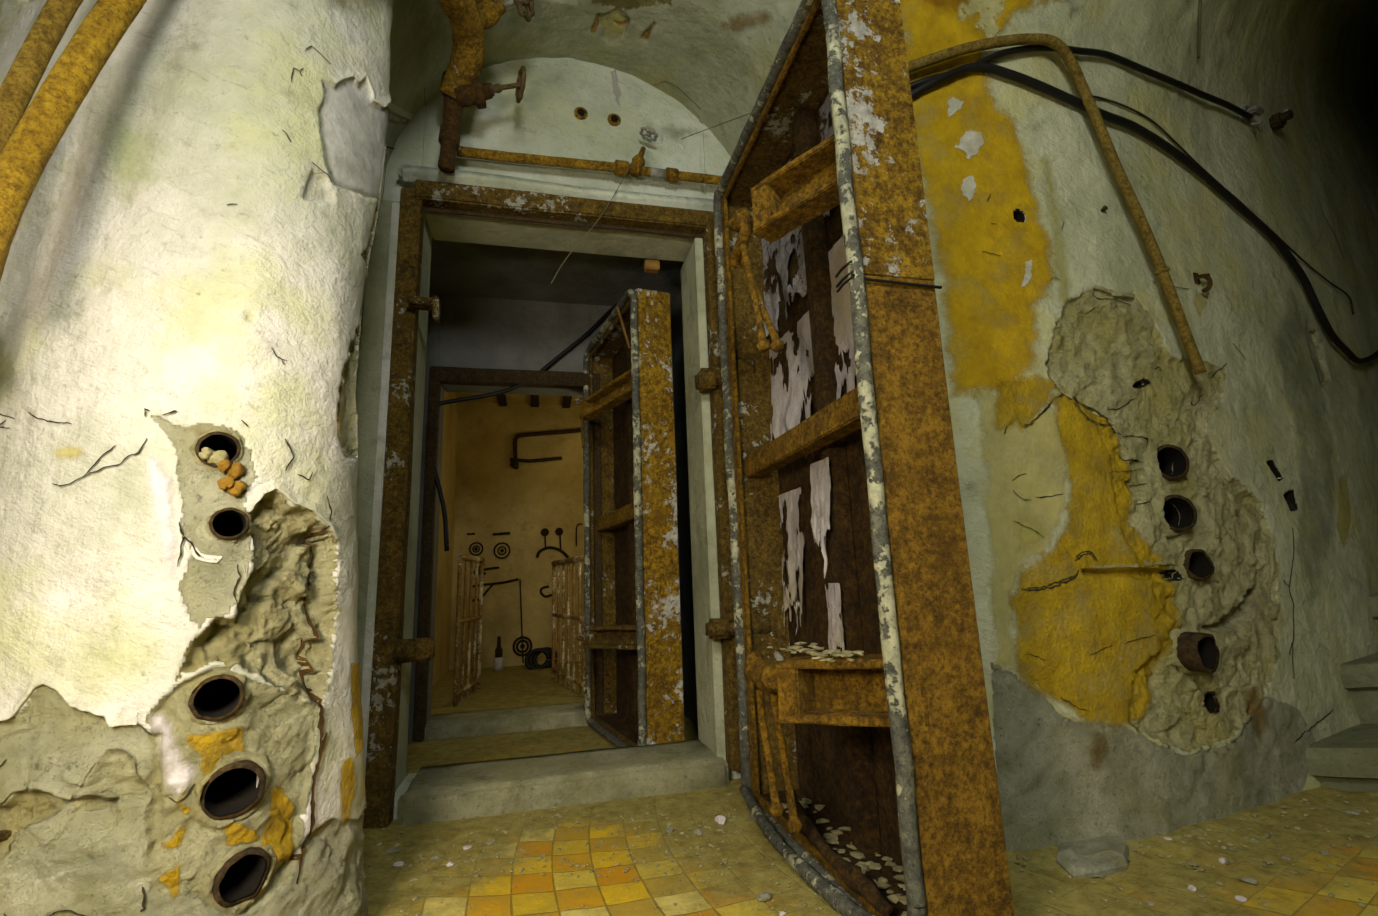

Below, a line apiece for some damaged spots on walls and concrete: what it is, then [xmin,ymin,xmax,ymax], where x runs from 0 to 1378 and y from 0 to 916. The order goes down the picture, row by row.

peeling [592,0,672,11]
peeling [322,67,413,282]
corrosion [900,0,1067,395]
crack [54,408,176,486]
spalling [337,308,362,458]
flaking render [0,415,368,916]
crack [282,439,332,884]
spalling [990,284,1316,852]
crack [49,908,86,916]
crack [139,887,147,912]